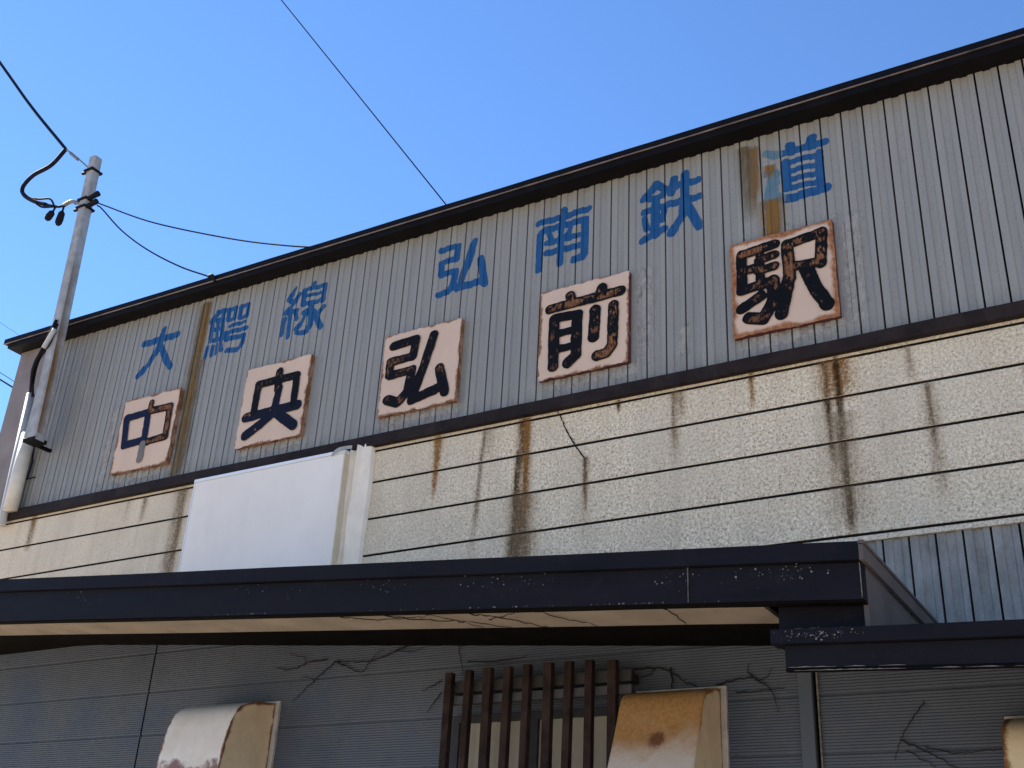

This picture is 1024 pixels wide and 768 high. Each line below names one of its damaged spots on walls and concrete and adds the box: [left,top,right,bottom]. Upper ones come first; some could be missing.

rust [738,146,780,235]
rust [432,436,441,491]
rust [508,418,530,557]
crack [557,411,586,470]
rust [822,356,854,526]